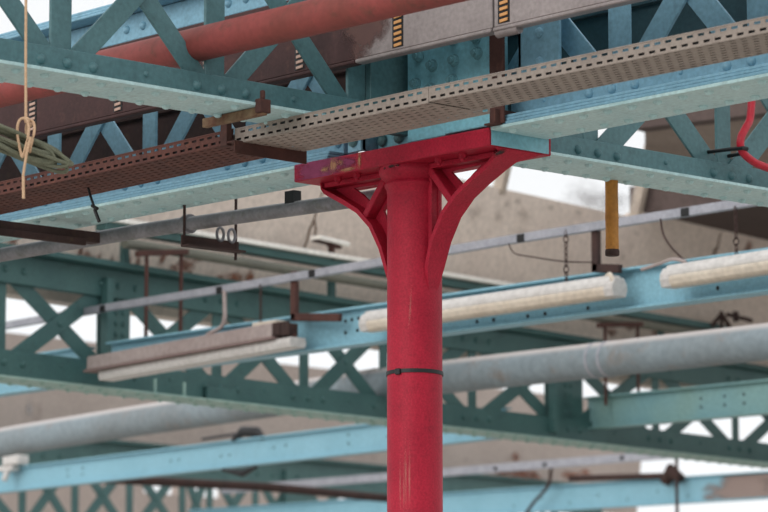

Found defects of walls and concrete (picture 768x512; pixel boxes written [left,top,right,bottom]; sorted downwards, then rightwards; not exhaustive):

peeling [294,155,360,180]
corrosion [218,272,254,281]
peeling [705,473,768,500]